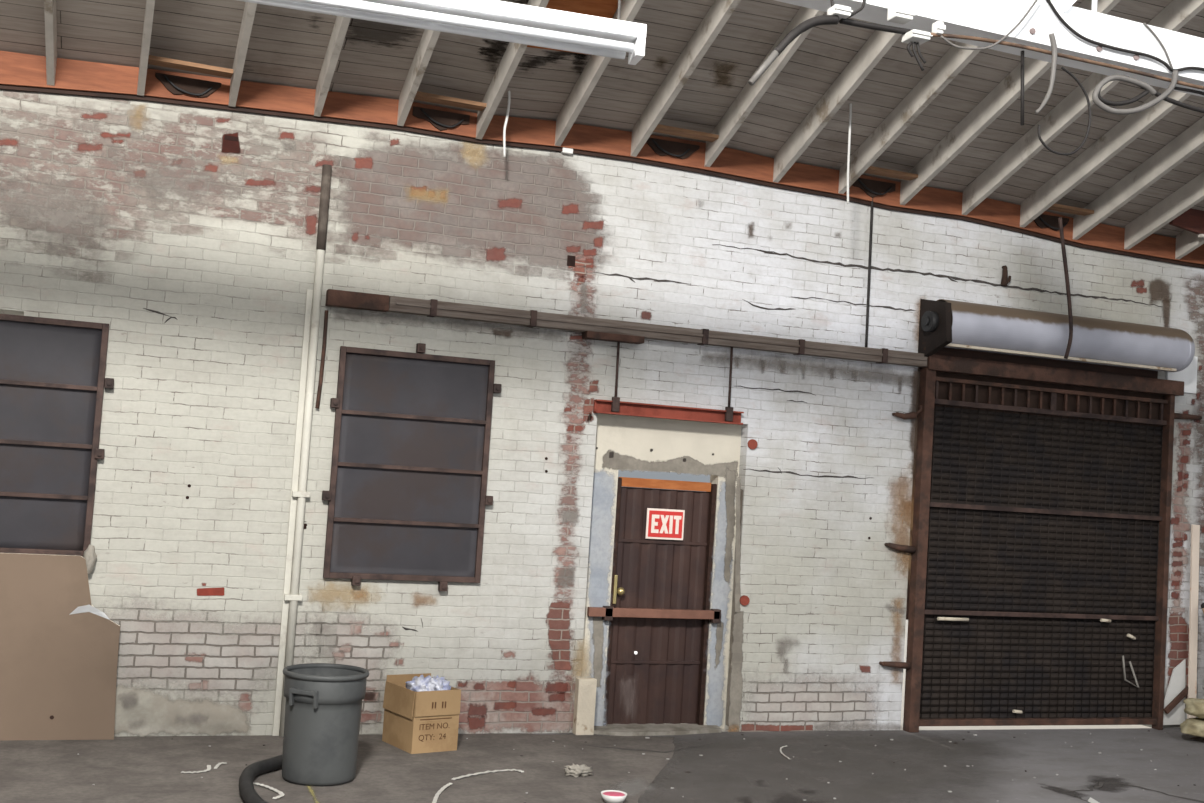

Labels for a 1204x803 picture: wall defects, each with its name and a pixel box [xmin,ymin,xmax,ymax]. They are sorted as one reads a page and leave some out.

water stain [480,40,509,71]
water stain [520,51,587,73]
peeling [0,95,604,317]
crack [594,272,688,284]
crack [742,297,916,311]
crack [712,244,1162,307]
crack [743,469,866,479]
rust [892,371,919,564]
peeling [1168,278,1204,699]
peeling [457,331,903,734]
spalling [111,606,403,727]
rust [888,600,903,679]